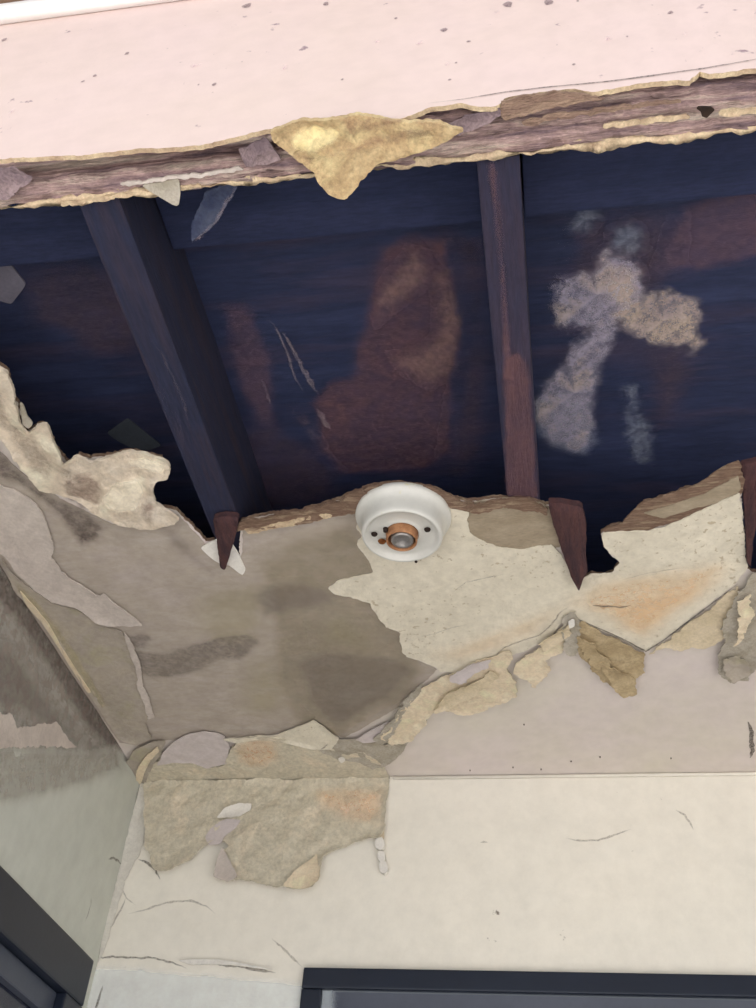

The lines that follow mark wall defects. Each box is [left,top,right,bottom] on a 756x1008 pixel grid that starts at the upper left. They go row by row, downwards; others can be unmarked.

peeling [0,187,158,209]
peeling [180,173,315,190]
peeling [373,126,756,171]
peeling [664,194,756,268]
leakage [535,210,702,453]
peeling [229,239,478,502]
peeling [504,355,537,497]
peeling [0,452,756,962]
crack [112,891,207,926]
crack [101,943,297,973]